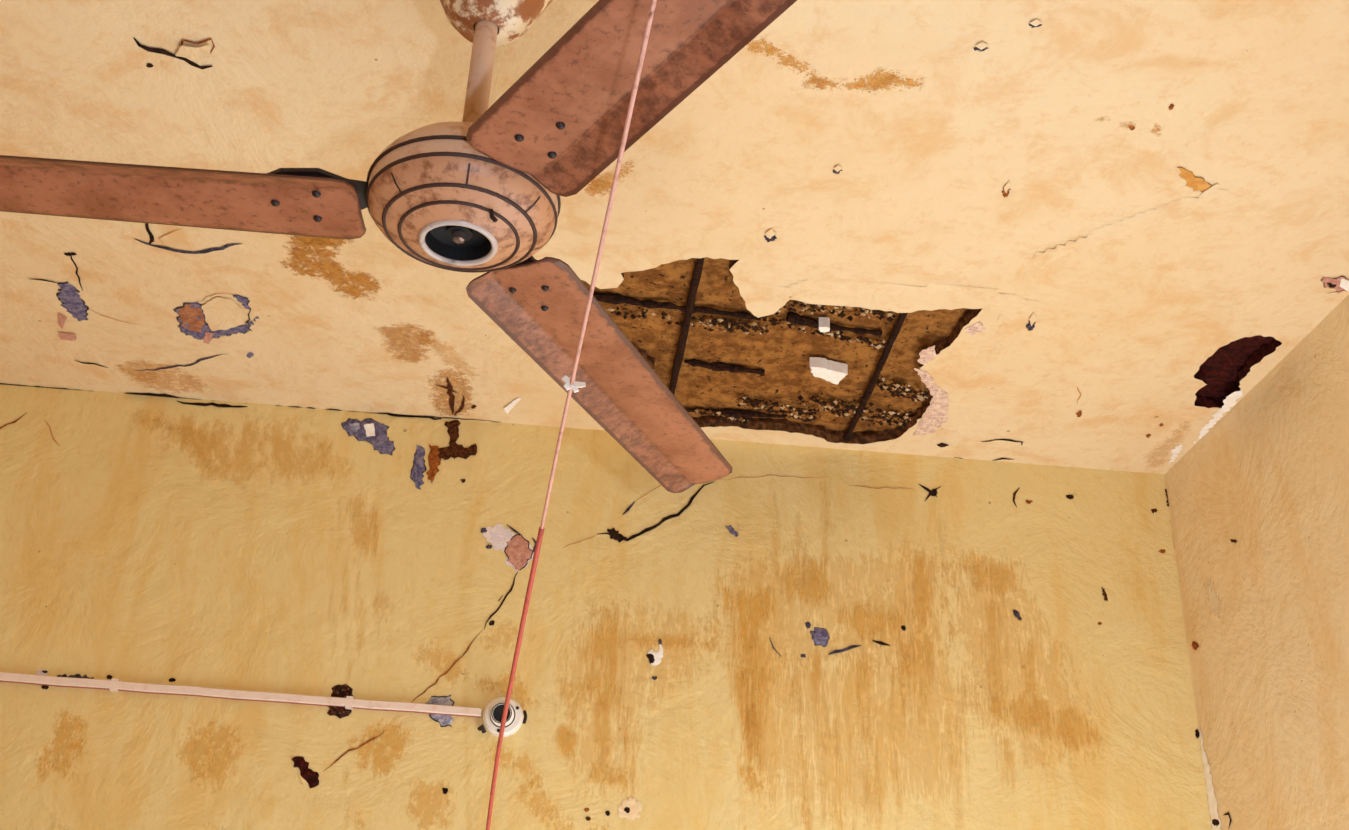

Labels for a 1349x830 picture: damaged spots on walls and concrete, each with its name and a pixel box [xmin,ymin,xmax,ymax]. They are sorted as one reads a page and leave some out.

crack [133,38,215,69]
crack [135,223,239,254]
peeling [32,252,137,341]
peeling [174,293,259,344]
spalling [581,257,985,444]
spalling [1169,335,1282,464]
peeling [481,524,536,571]
crack [563,475,941,548]